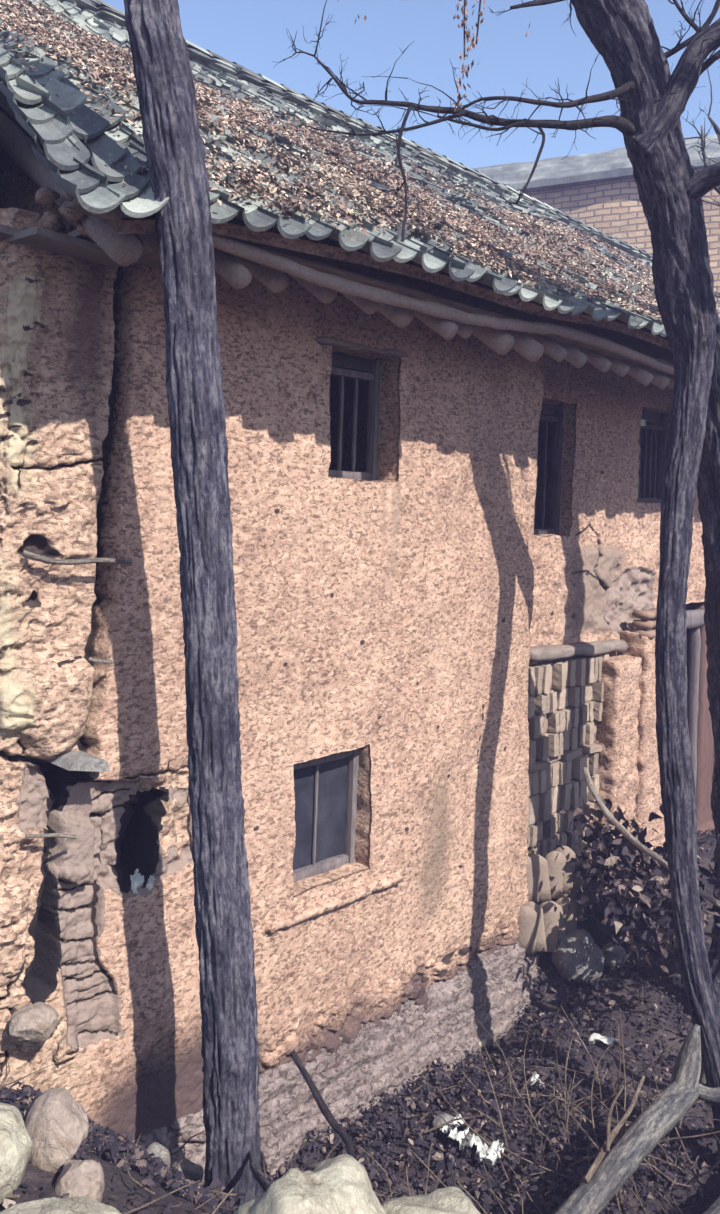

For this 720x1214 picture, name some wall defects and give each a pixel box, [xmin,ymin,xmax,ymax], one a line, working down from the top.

spalling [17,534,63,564]
crack [11,266,123,667]
spalling [604,563,656,638]
crack [0,736,192,1076]
spalling [20,762,194,1049]
spalling [417,947,473,998]